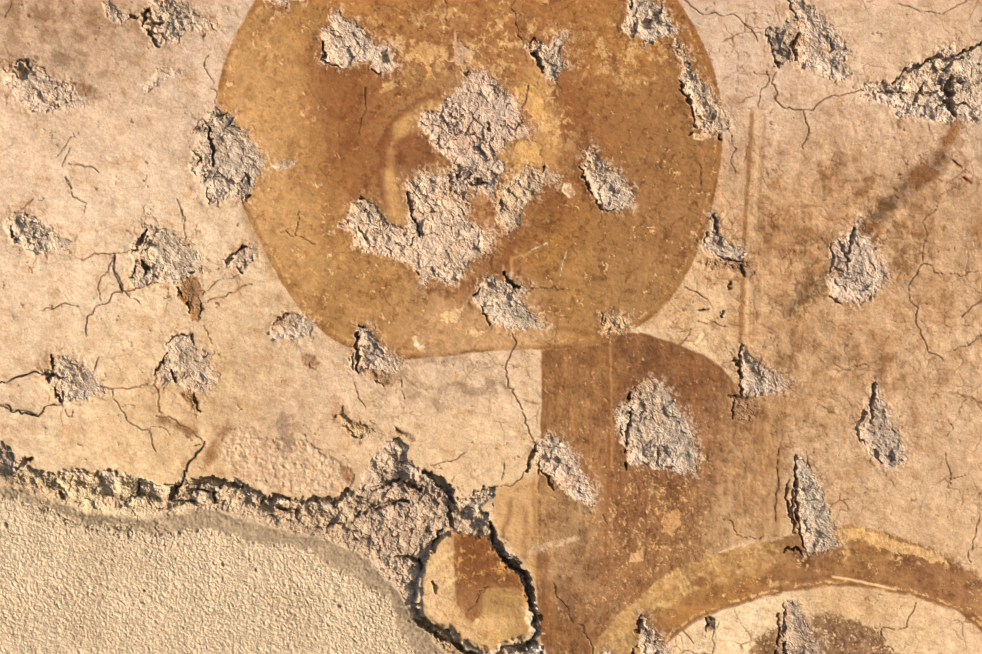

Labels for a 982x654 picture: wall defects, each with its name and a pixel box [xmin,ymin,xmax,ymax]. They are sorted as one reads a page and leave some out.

spalling [186,97,297,215]
spalling [336,24,636,338]
spalling [612,0,731,141]
spalling [764,0,855,83]
crack [758,73,863,146]
spalling [858,39,982,137]
crack [43,251,151,332]
crack [907,204,981,356]
crack [0,371,73,418]
crack [94,359,204,489]
crack [504,334,532,438]
spalling [615,378,710,476]